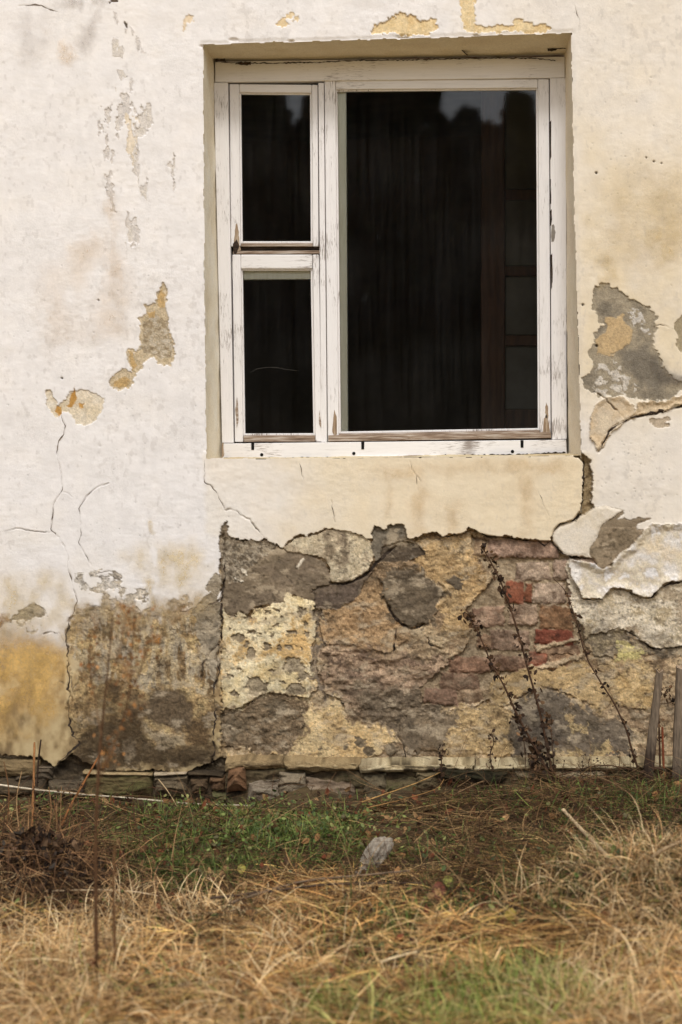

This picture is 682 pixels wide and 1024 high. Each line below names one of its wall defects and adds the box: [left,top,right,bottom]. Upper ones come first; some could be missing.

peeling [372,13,439,37]
peeling [460,0,552,34]
peeling [98,37,153,248]
peeling [110,283,176,392]
peeling [581,284,682,402]
peeling [46,390,105,426]
peeling [650,417,671,428]
crack [2,417,117,764]
spalling [0,505,682,803]